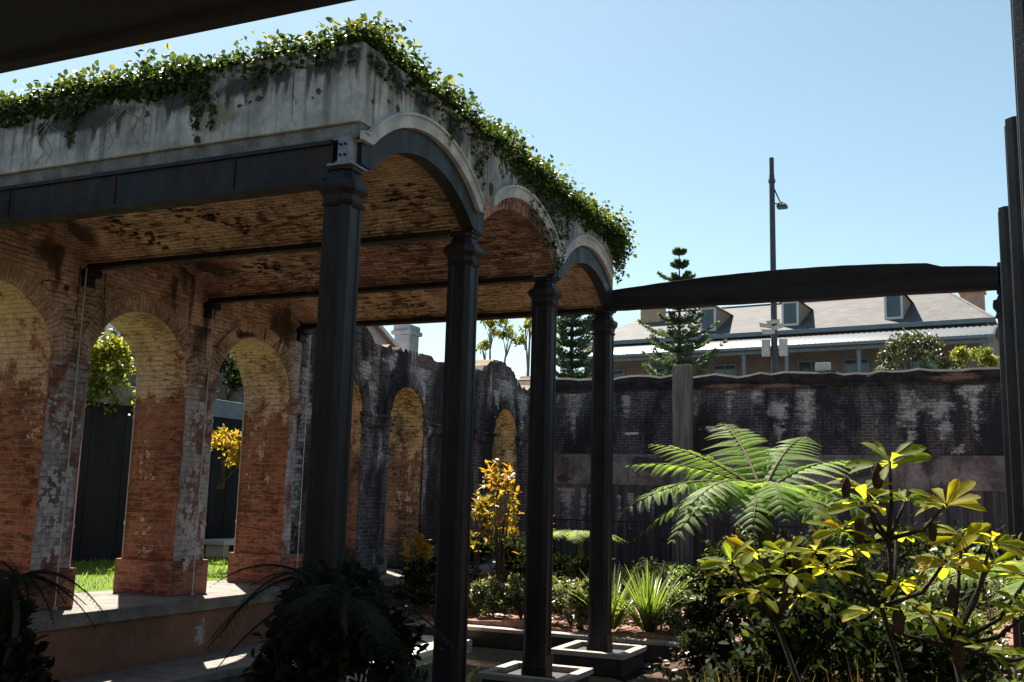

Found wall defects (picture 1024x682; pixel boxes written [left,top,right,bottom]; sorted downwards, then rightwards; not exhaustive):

water stain [32,106,135,143]
water stain [156,91,204,121]
water stain [212,67,292,123]
water stain [307,47,403,99]
peeling [22,386,82,450]
water stain [752,391,814,440]
water stain [900,385,984,443]
peeling [22,462,74,563]
peeling [177,400,211,571]